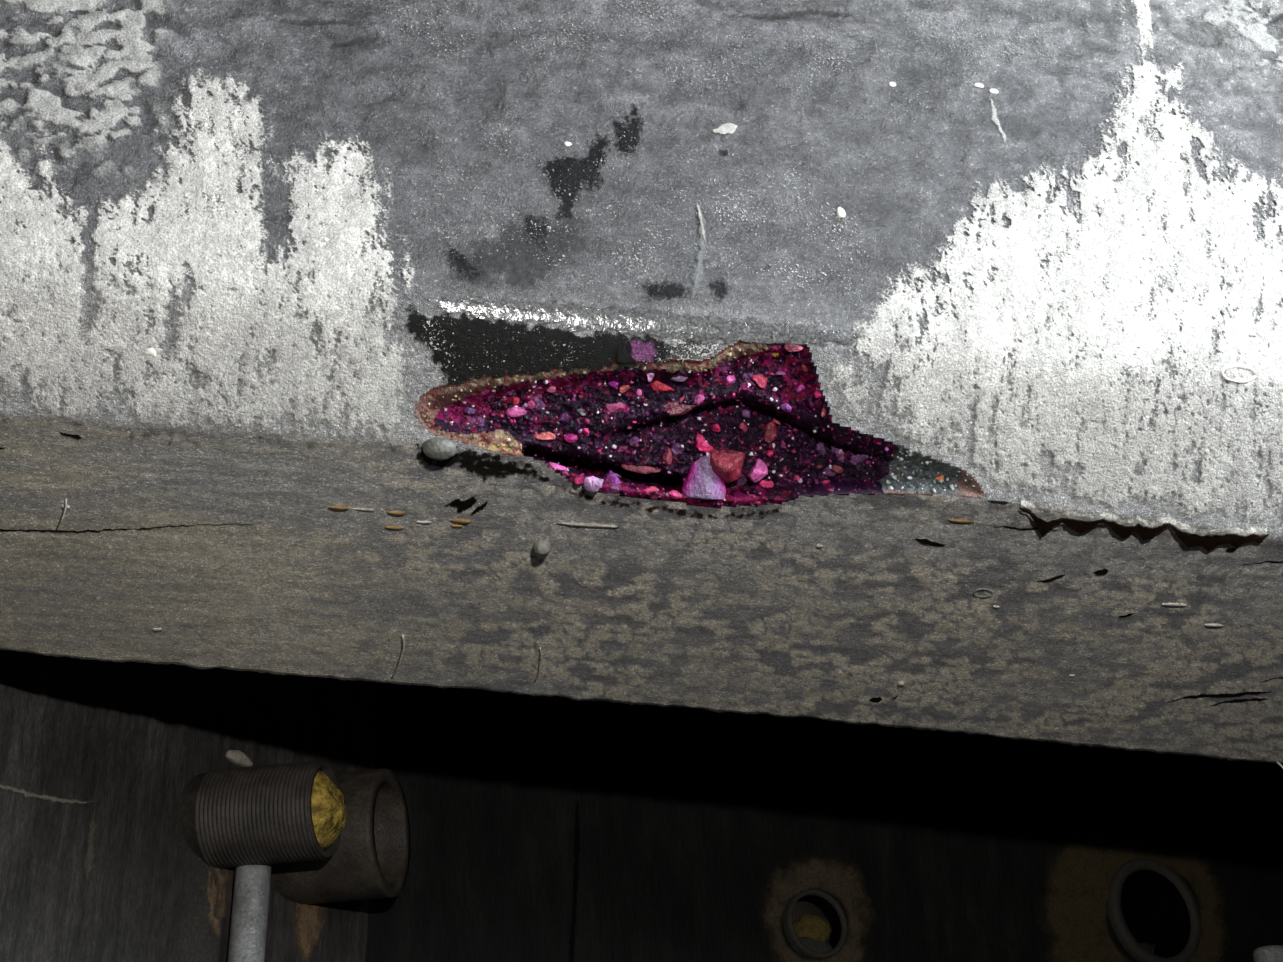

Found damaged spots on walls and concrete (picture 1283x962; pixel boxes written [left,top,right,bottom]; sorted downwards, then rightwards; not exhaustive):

water stain [0,0,1283,527]
spalling [415,334,987,509]
crack [0,523,264,533]
peeling [1020,500,1267,538]
crack [1166,677,1283,706]